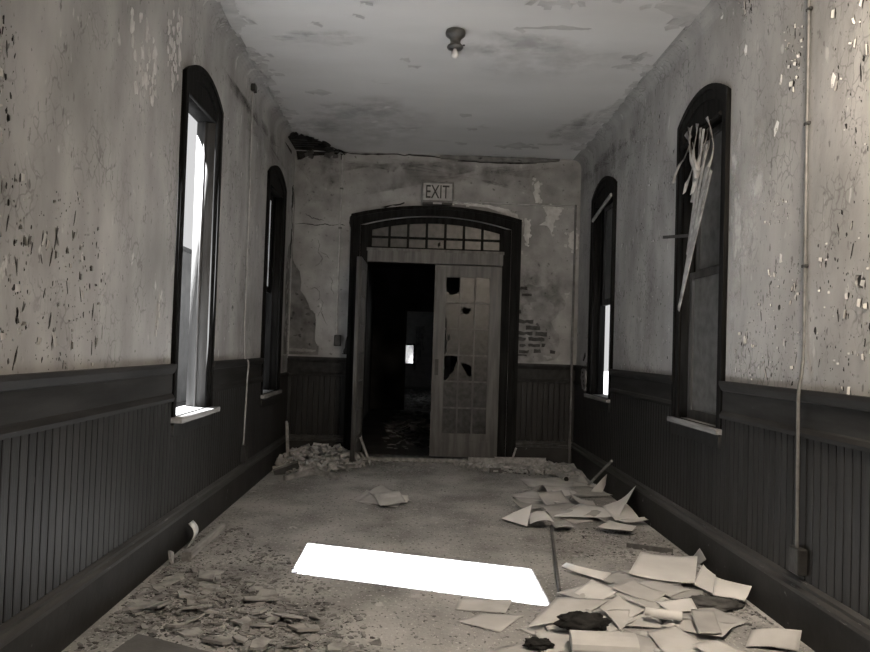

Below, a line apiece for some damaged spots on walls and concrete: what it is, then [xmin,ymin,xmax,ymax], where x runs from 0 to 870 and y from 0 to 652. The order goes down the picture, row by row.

peeling [0,6,16,143]
peeling [130,8,183,107]
peeling [831,0,870,163]
peeling [0,164,30,237]
peeling [5,190,106,370]
spalling [280,189,320,373]
peeling [289,132,346,159]
peeling [453,177,579,253]
peeling [817,210,870,322]
peeling [814,323,870,395]